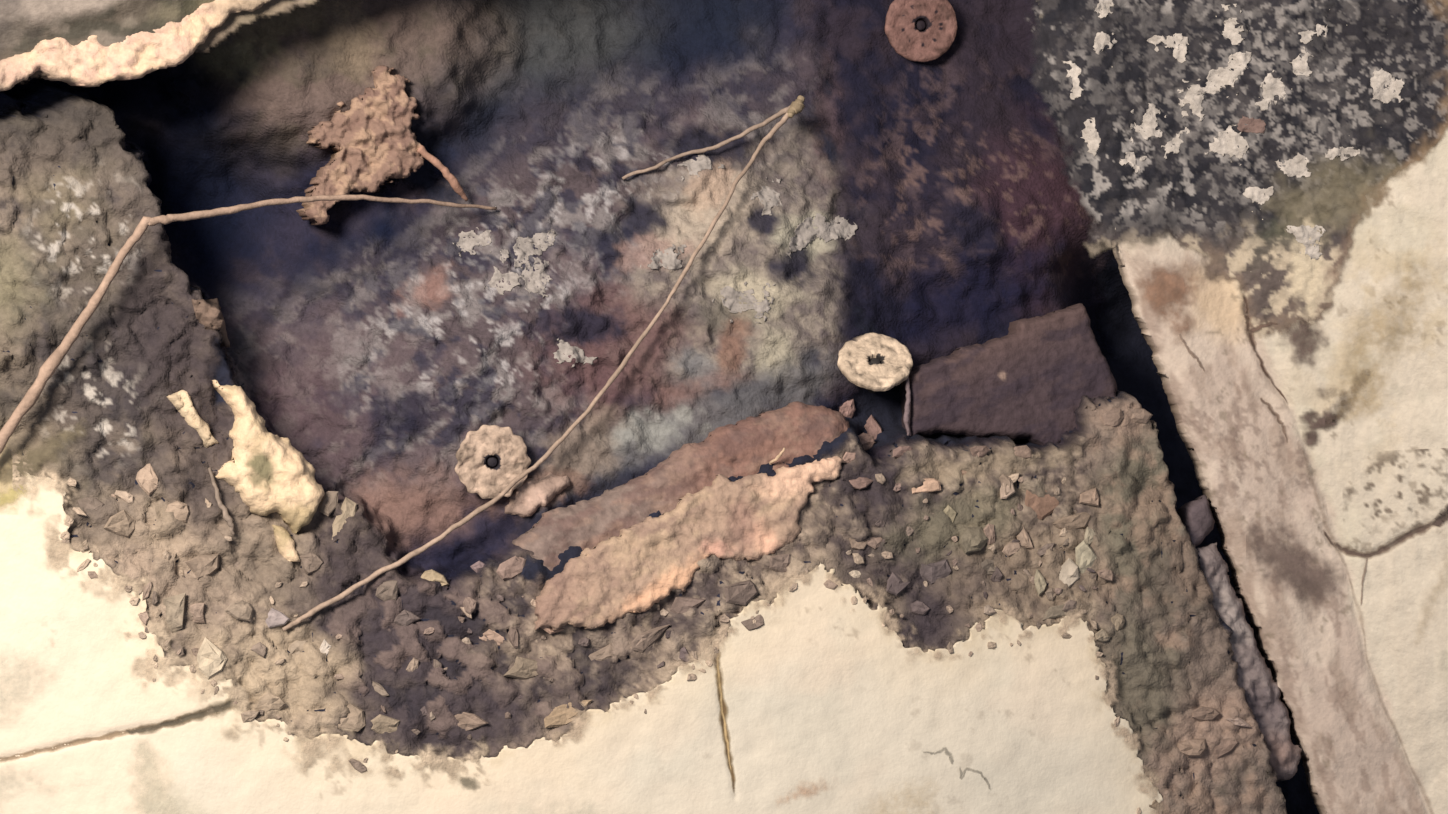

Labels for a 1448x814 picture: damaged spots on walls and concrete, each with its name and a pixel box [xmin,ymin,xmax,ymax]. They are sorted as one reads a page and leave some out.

spalling [0,0,271,91]
peeling [296,65,425,225]
rust [817,0,1113,370]
damp [1028,0,1448,363]
peeling [192,298,230,347]
damp [0,0,863,580]
crack [1179,334,1205,371]
crack [1243,296,1287,441]
damp [1302,374,1373,446]
spalling [12,380,1287,814]
crack [1324,505,1448,604]
crack [0,697,255,761]